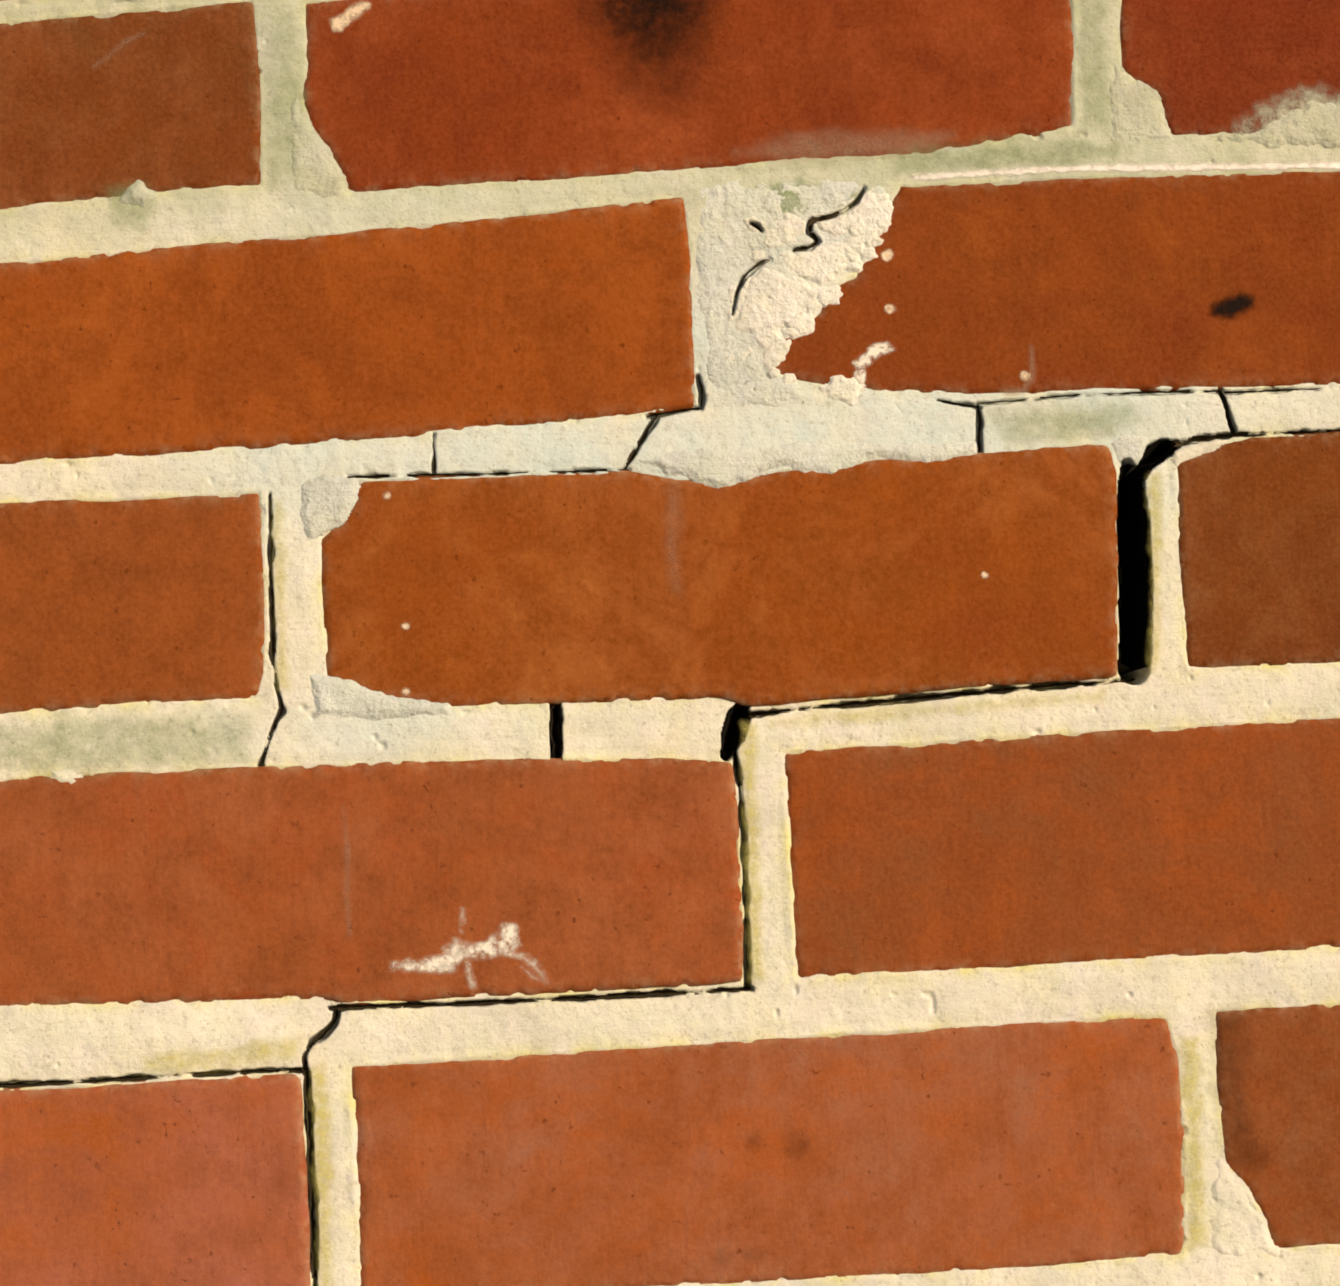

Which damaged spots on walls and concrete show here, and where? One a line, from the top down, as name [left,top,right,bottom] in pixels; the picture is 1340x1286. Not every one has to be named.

spalling [696,179,894,407]
crack [732,189,864,314]
crack [0,376,1340,1286]